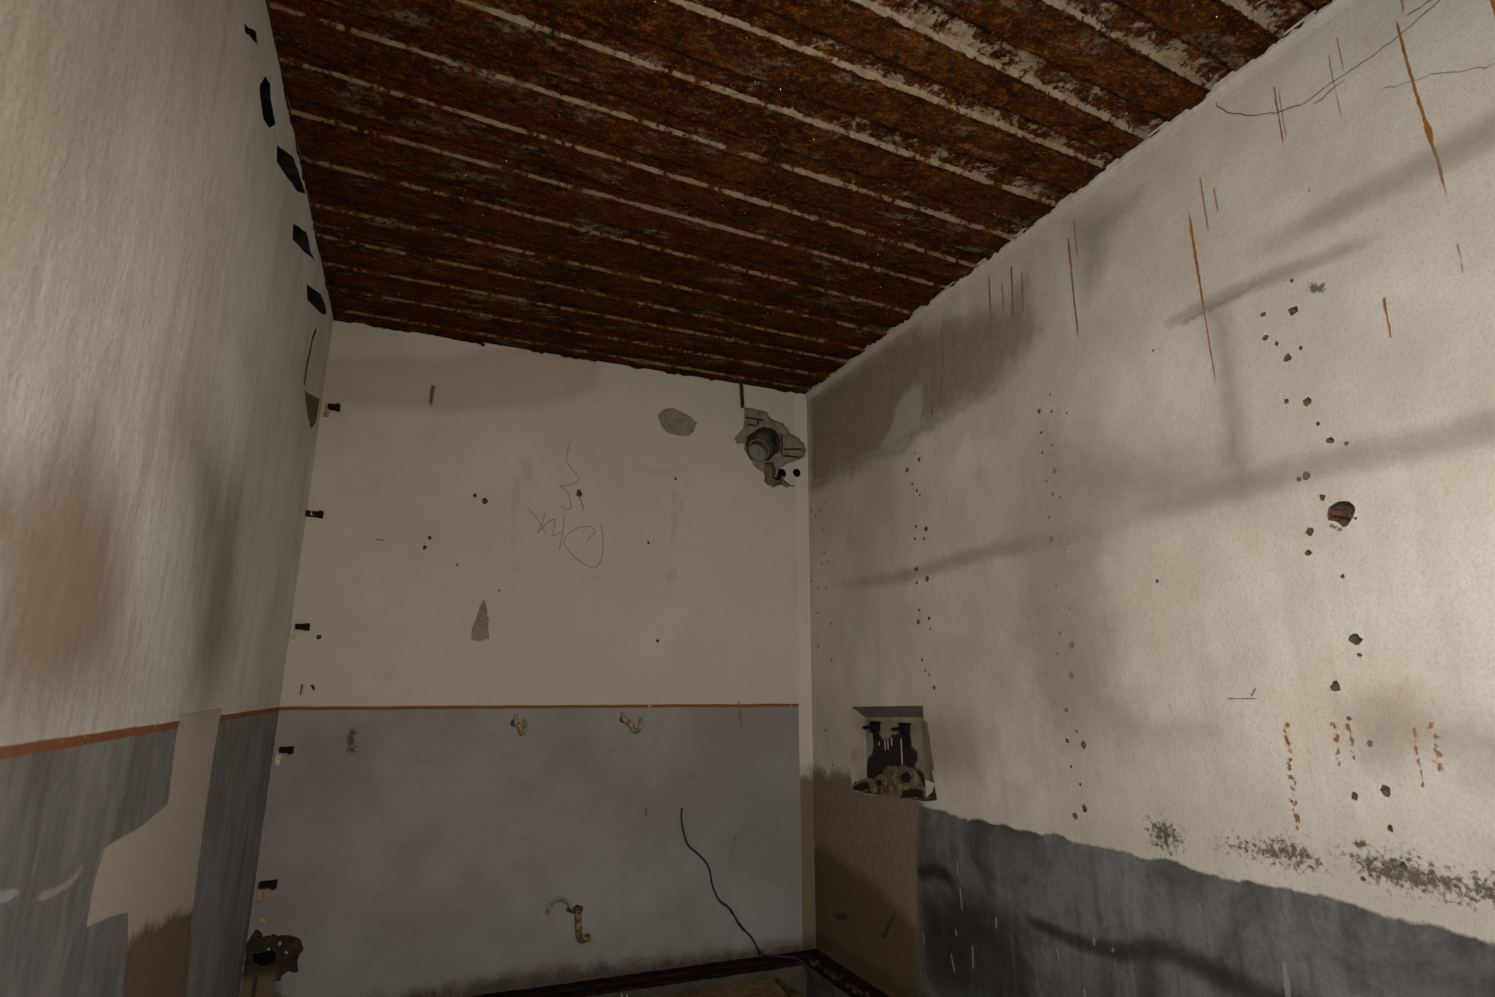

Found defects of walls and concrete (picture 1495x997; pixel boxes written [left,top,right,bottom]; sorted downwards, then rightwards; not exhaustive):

crack [1216,0,1495,116]
corrosion [1397,23,1445,189]
corrosion [1189,217,1215,377]
spalling [657,408,697,436]
spalling [735,407,806,488]
spalling [1327,501,1357,531]
spalling [471,600,489,641]
corrosion [1283,722,1300,830]
corrosion [1412,722,1443,787]
water stain [1141,809,1187,856]
water stain [1215,830,1495,915]
spalling [242,917,303,997]